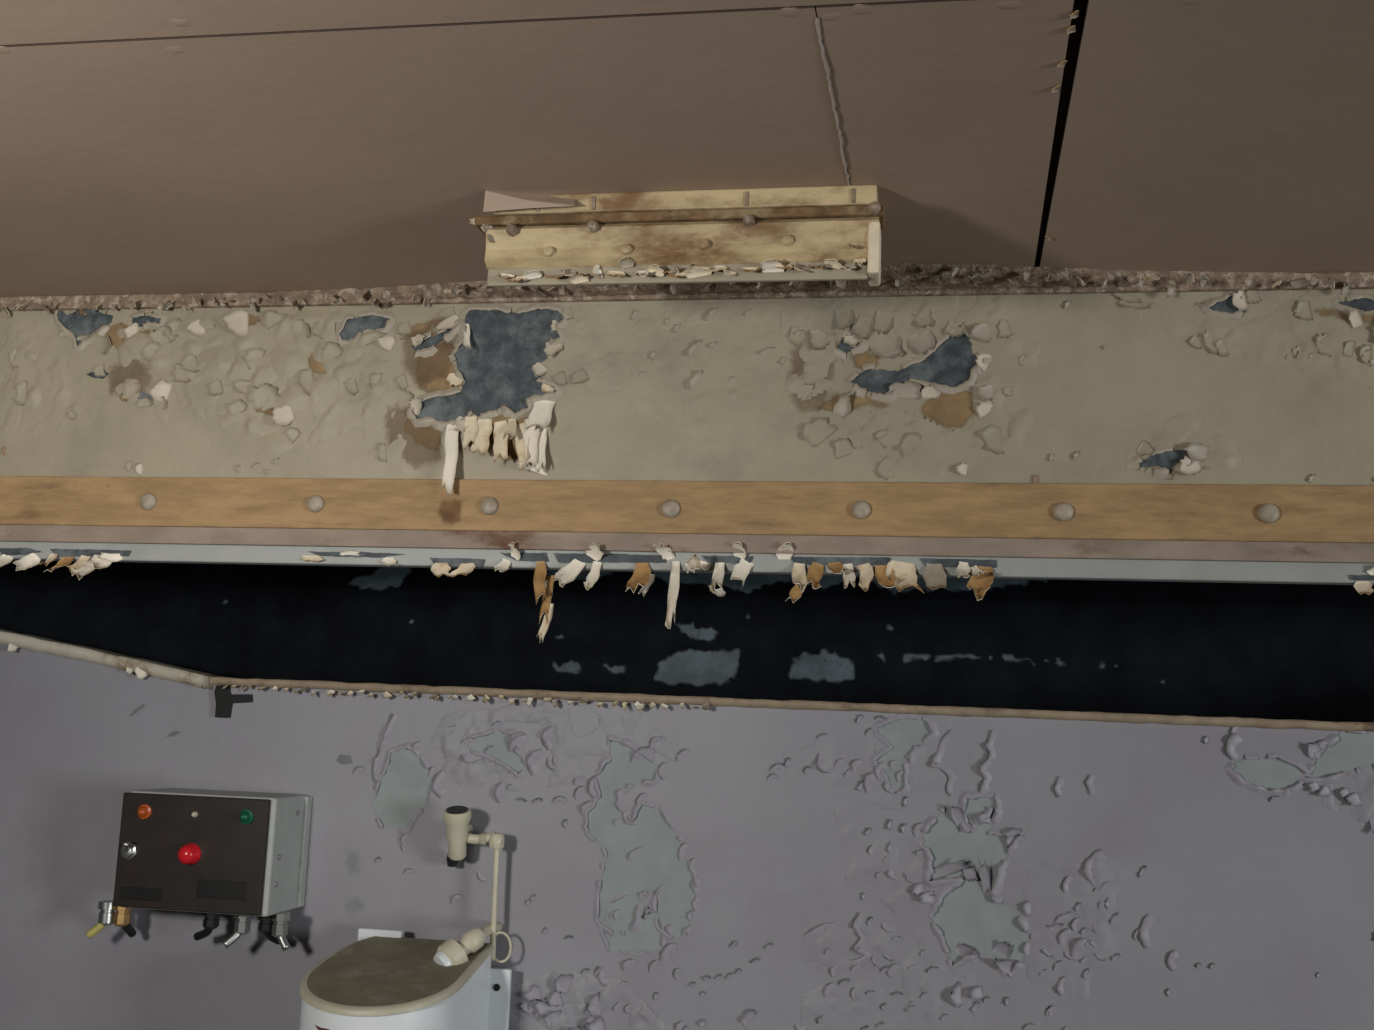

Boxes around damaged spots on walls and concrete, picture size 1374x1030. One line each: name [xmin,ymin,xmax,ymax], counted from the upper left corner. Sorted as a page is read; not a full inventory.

peeling [53,302,590,495]
peeling [781,295,1040,480]
peeling [1125,412,1245,481]
peeling [1114,289,1374,390]
peeling [0,548,131,580]
peeling [430,542,1048,686]
peeling [222,685,710,1014]
peeling [864,790,1179,1030]
peeling [1202,727,1374,833]